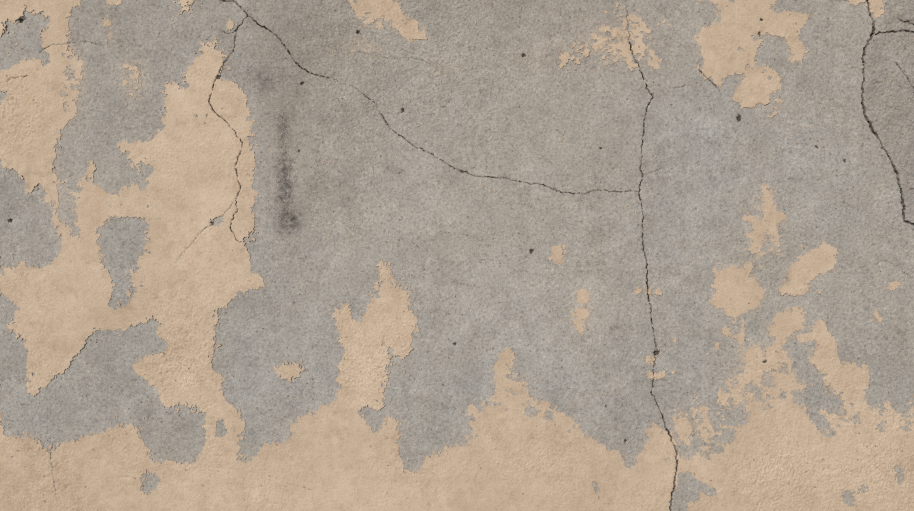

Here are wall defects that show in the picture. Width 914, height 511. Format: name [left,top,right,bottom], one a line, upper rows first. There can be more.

peeling [0,5,51,71]
crack [861,0,914,225]
peeling [0,160,62,276]
peeling [96,216,151,310]
crack [176,0,678,511]
peeling [0,292,206,464]
peeling [215,419,228,437]
peeling [741,362,789,410]